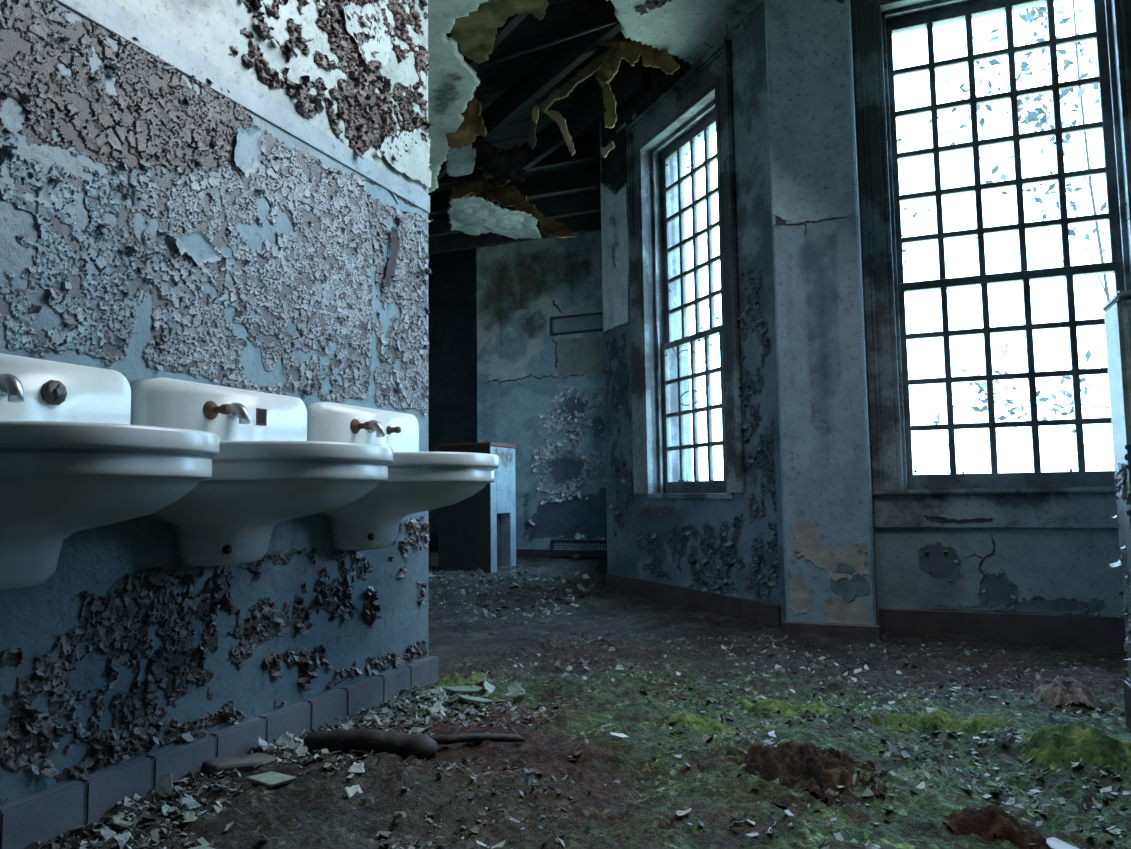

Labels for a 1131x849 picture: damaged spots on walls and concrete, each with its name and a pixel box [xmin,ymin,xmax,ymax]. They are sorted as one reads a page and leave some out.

flaking render [601,54,691,193]
peeling [0,0,433,418]
crack [481,300,590,384]
damp [483,250,590,337]
crack [771,213,854,236]
peeling [528,334,634,542]
peeling [637,263,871,625]
peeling [388,515,430,605]
crack [966,533,996,602]
peeling [1109,445,1131,660]
peeling [0,547,428,783]
peeling [344,785,363,798]